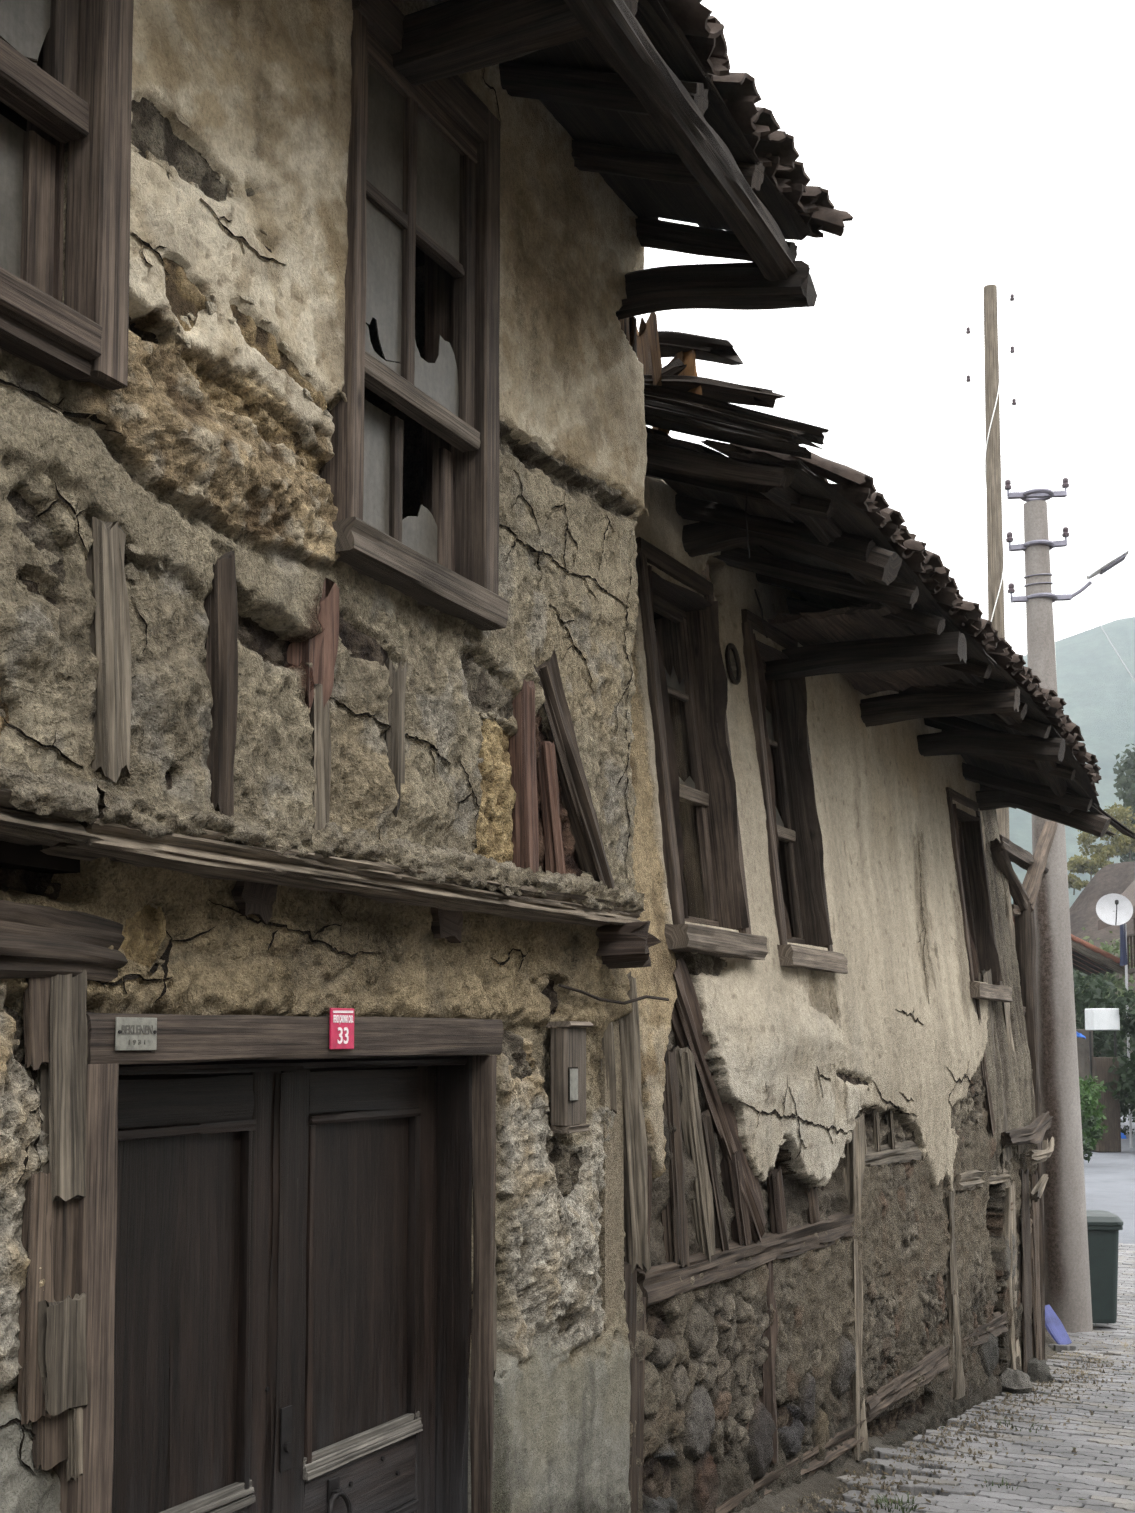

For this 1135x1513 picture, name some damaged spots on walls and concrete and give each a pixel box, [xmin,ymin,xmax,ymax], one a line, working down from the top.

spalling [131,97,255,202]
crack [199,198,286,266]
spalling [163,257,347,476]
crack [499,470,633,885]
crack [92,899,382,1008]
spalling [3,1004,25,1063]
spalling [760,1138,797,1185]
crack [738,1059,980,1159]
spalling [855,1077,924,1159]
spalling [950,1095,979,1135]